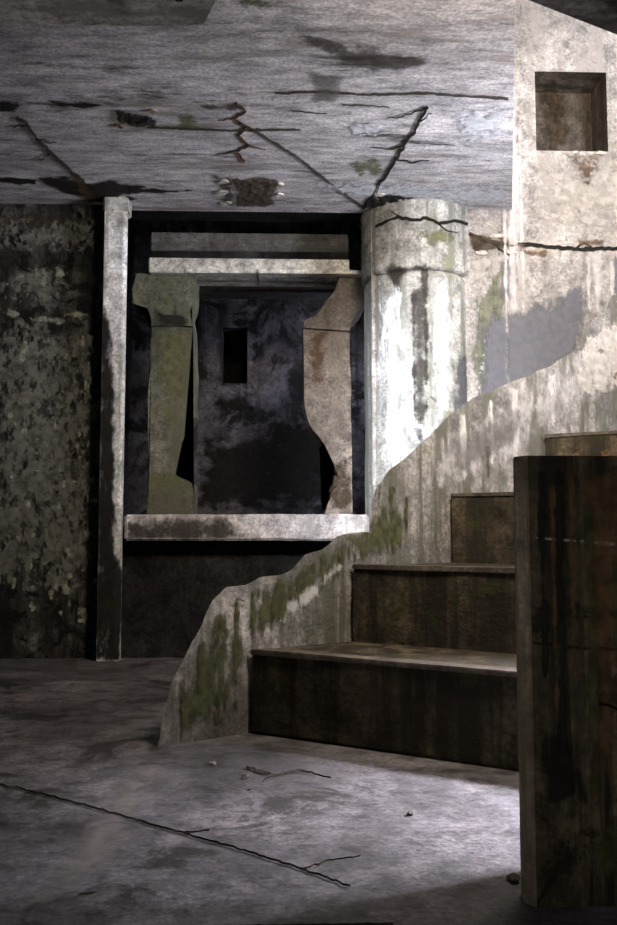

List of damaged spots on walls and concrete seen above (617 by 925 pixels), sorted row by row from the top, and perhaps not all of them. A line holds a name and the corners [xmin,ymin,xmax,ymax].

damp [0,214,100,253]
spalling [216,177,284,207]
crack [147,90,617,257]
spalling [470,233,517,302]
damp [477,94,525,382]
damp [539,91,569,149]
damp [387,264,429,444]
peeling [477,288,617,396]
damp [427,344,601,486]
damp [0,307,122,660]
damp [128,518,242,540]
damp [249,551,344,637]